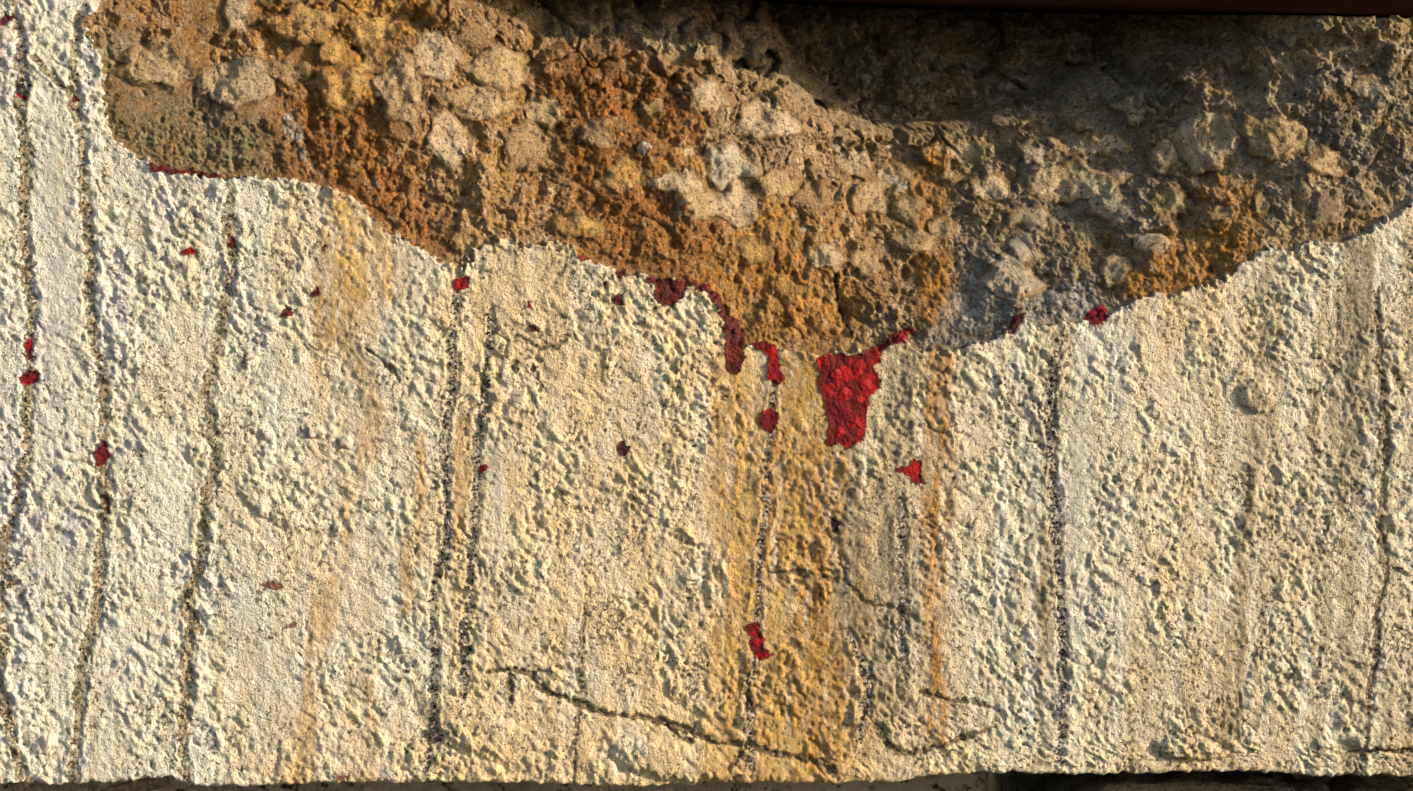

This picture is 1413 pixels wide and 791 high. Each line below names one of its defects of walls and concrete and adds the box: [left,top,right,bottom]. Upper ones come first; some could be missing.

peeling [20,339,40,386]
rust [250,0,450,346]
rust [540,52,866,784]
crack [423,289,995,785]
spalling [82,0,1413,450]
rust [915,143,949,323]
rust [923,344,953,748]
leakage [834,258,1101,716]